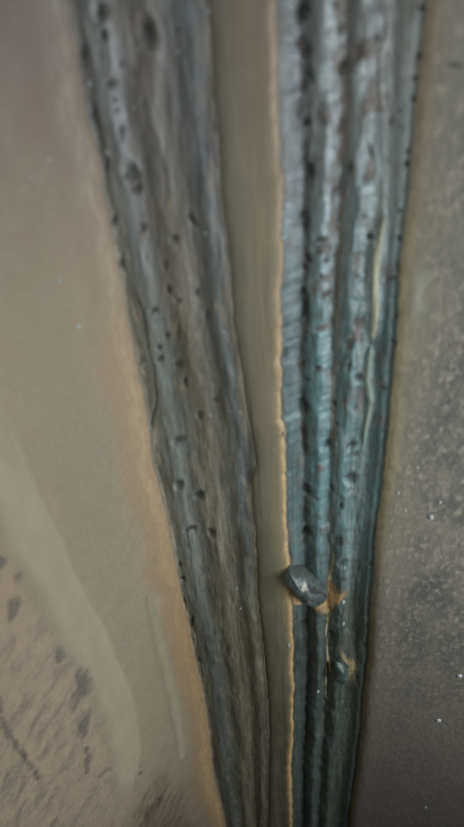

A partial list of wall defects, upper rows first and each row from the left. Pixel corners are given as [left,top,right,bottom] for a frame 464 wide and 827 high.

rust [313,547,345,699]
rust [342,653,356,676]